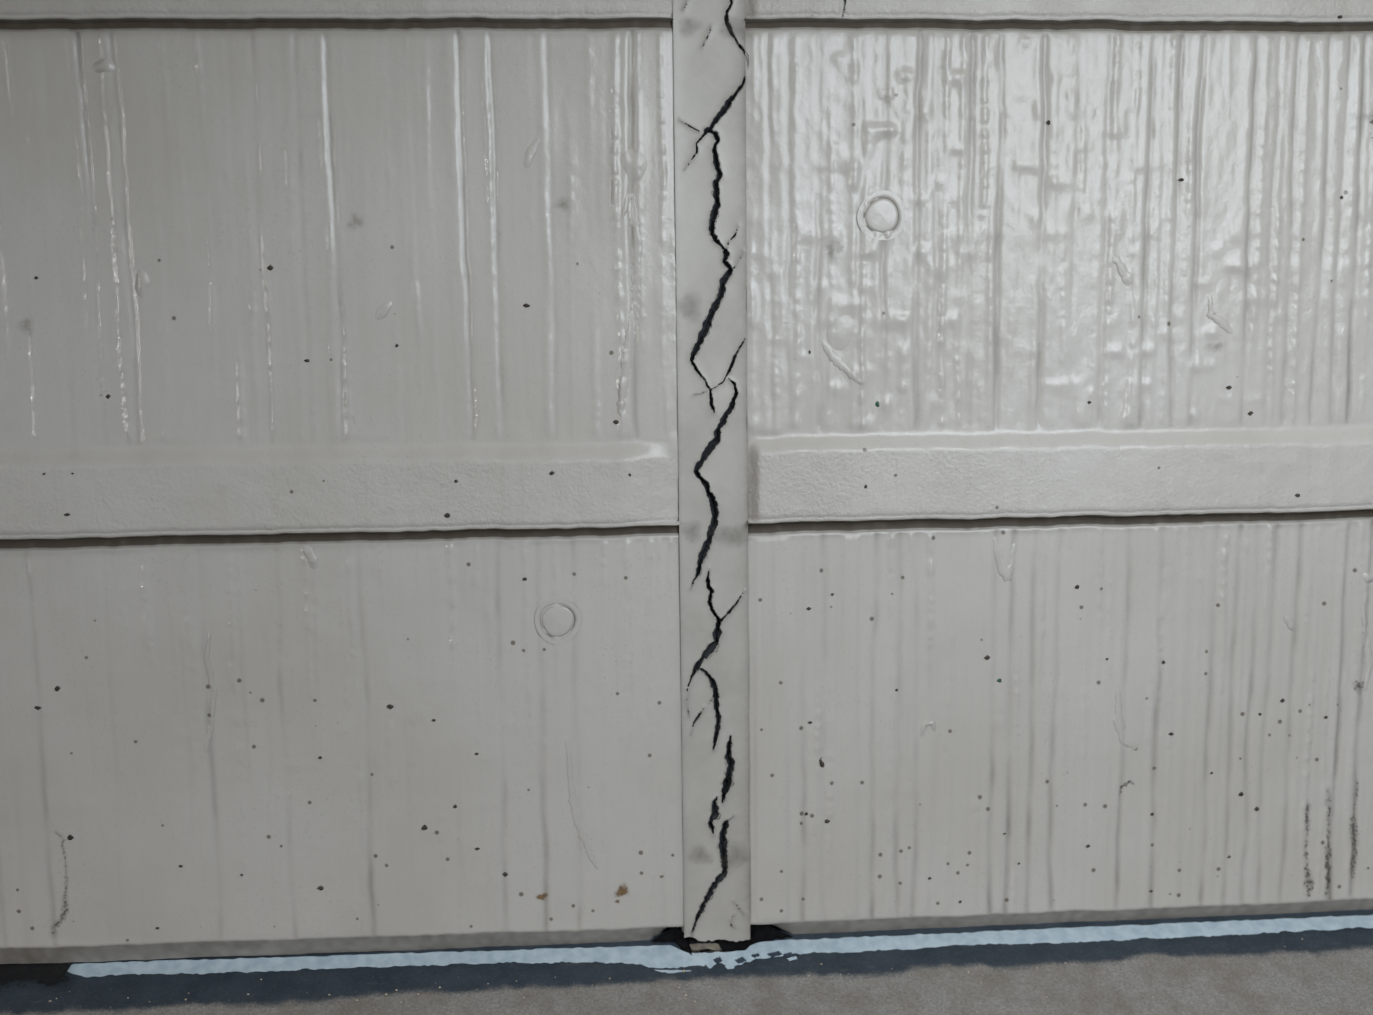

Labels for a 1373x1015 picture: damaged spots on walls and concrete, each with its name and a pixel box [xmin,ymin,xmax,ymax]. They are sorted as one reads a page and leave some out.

crack [684,0,749,937]